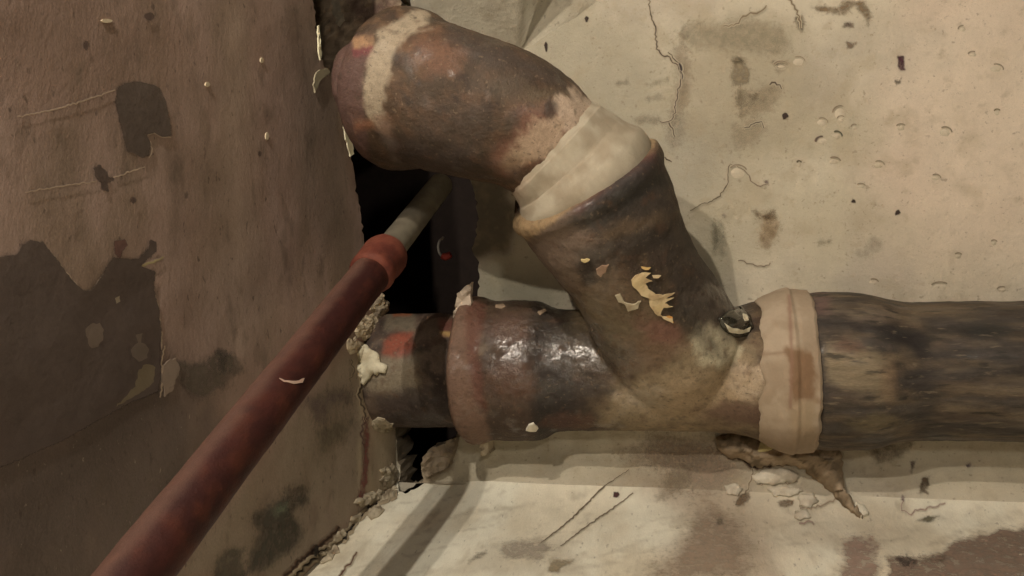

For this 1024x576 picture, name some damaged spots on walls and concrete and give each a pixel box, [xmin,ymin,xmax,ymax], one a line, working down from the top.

crack [647,0,684,163]
peeling [17,82,171,193]
crack [690,163,768,212]
peeling [0,239,180,467]
crack [540,469,634,546]
peeling [724,483,749,505]
peeling [751,468,819,508]